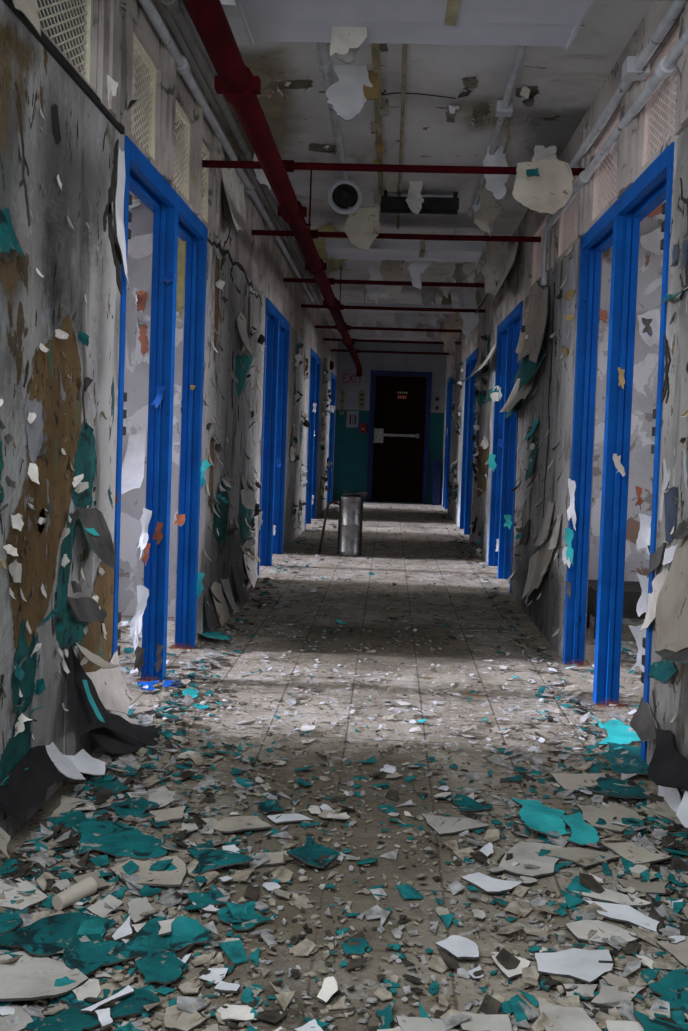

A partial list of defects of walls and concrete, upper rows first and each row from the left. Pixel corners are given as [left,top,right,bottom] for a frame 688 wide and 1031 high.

spalling [39,103,61,145]
peeling [107,2,137,121]
peeling [210,255,266,428]
peeling [516,245,576,417]
peeling [0,314,114,786]
peeling [199,398,262,587]
peeling [507,546,562,606]
peeling [510,426,564,557]